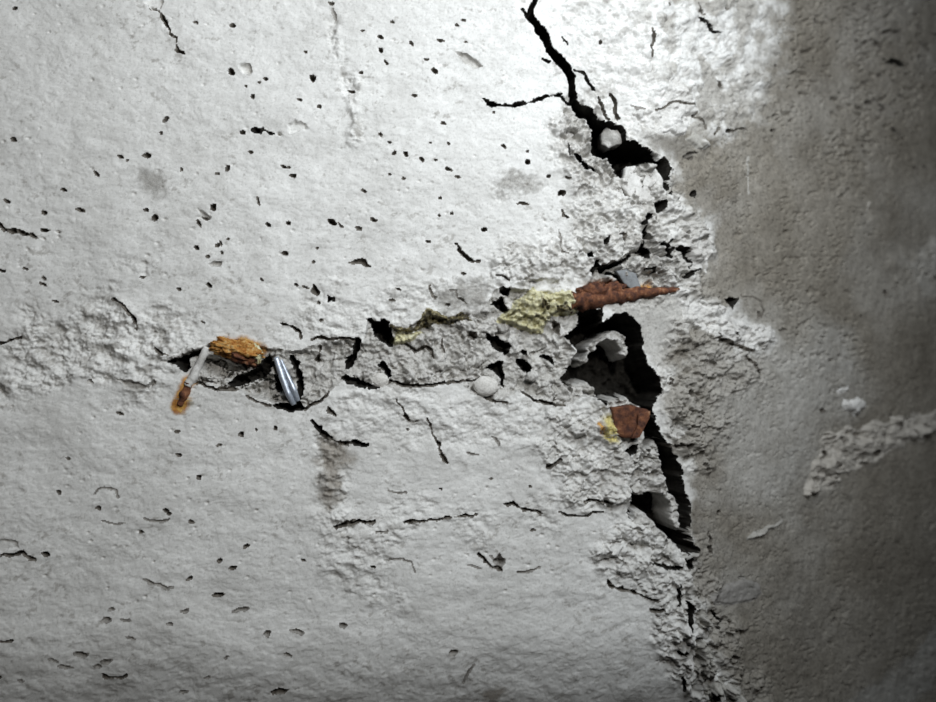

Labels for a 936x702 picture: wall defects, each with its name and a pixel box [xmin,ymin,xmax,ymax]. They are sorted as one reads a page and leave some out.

crack [649,27,657,57]
crack [482,0,598,127]
crack [668,190,697,198]
crack [558,209,570,254]
crack [454,243,510,281]
rust [570,279,680,314]
rust [231,337,267,368]
rust [171,377,194,414]
spalling [167,286,713,556]
rust [598,404,650,442]
crack [546,458,563,470]